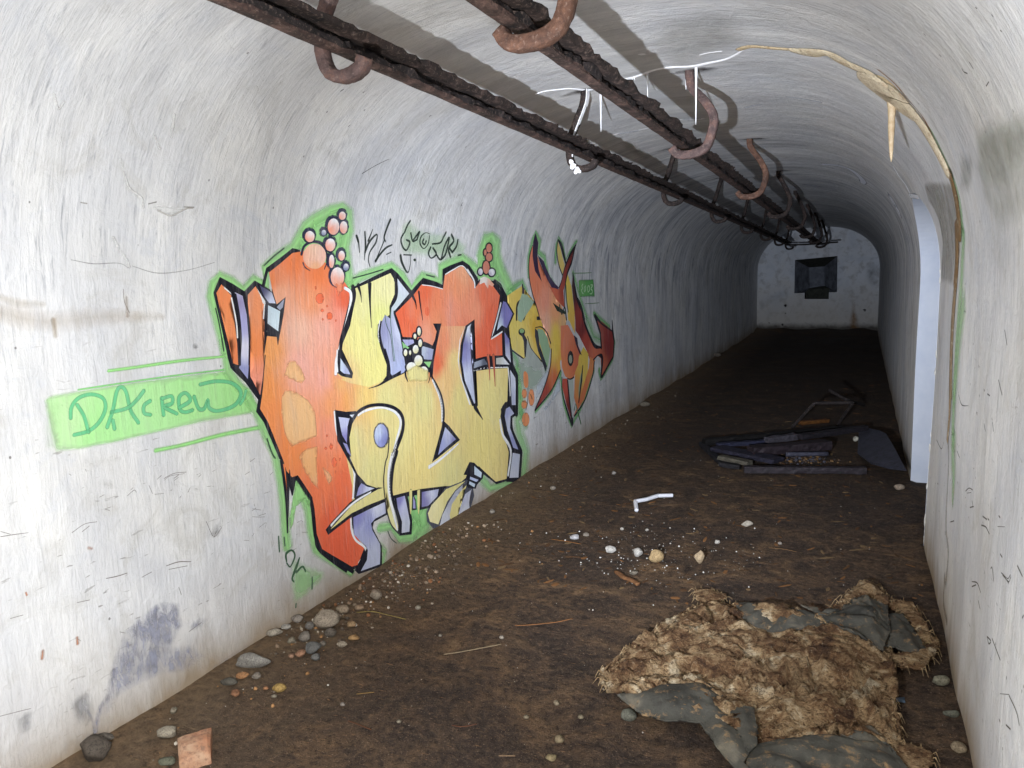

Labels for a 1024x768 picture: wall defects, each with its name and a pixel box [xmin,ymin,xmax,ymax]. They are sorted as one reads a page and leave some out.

crack [536,87,593,95]
crack [625,45,961,444]